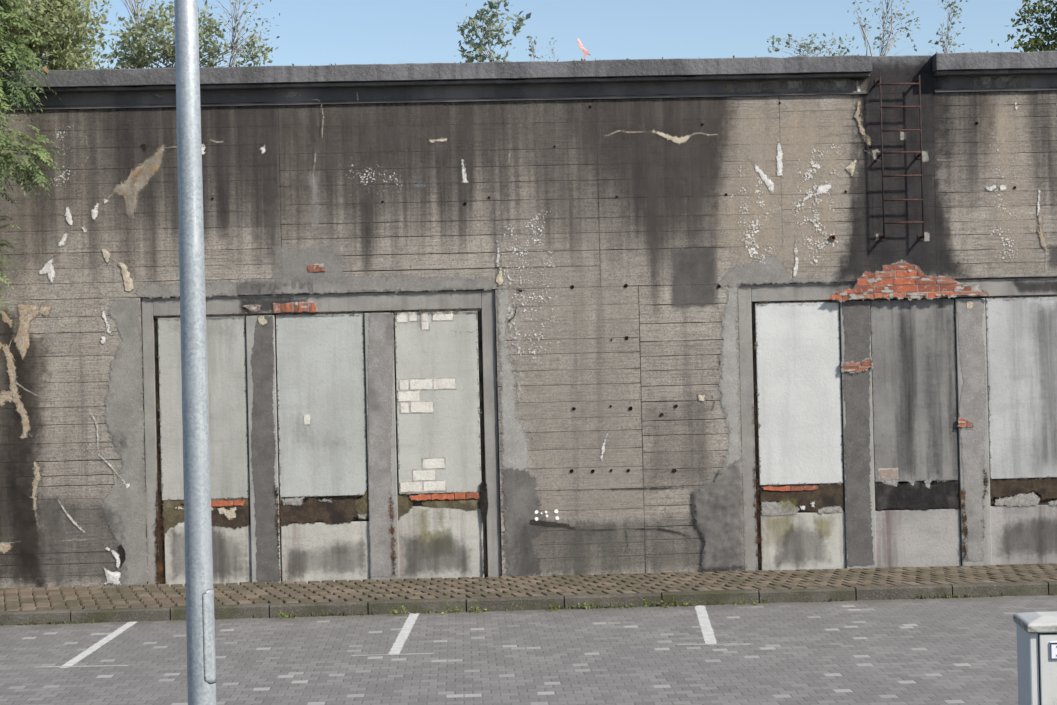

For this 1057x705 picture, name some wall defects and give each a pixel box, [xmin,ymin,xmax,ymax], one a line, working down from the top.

damp [31,104,174,245]
damp [200,97,473,260]
damp [490,62,962,281]
peeling [39,256,55,284]
peeling [101,248,135,292]
peeling [0,302,52,359]
peeling [761,259,1057,567]
spalling [0,541,19,565]
damp [212,531,229,577]
damp [290,551,305,575]
damp [408,540,466,573]
damp [564,524,628,575]